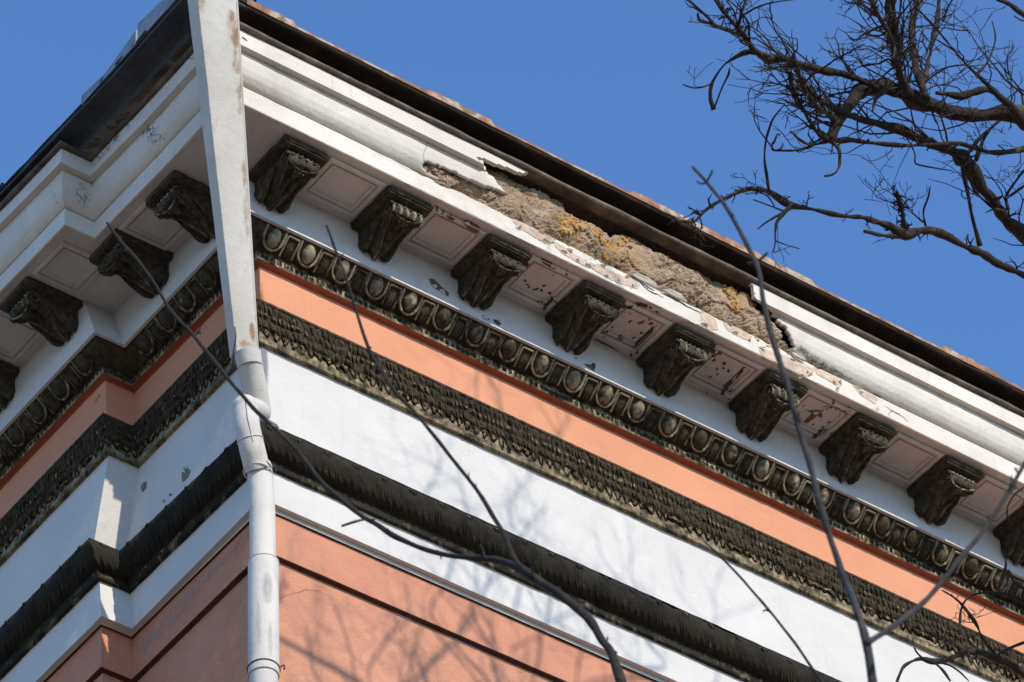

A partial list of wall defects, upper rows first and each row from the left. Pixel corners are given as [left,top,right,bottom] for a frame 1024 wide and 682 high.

spalling [415,163,880,439]